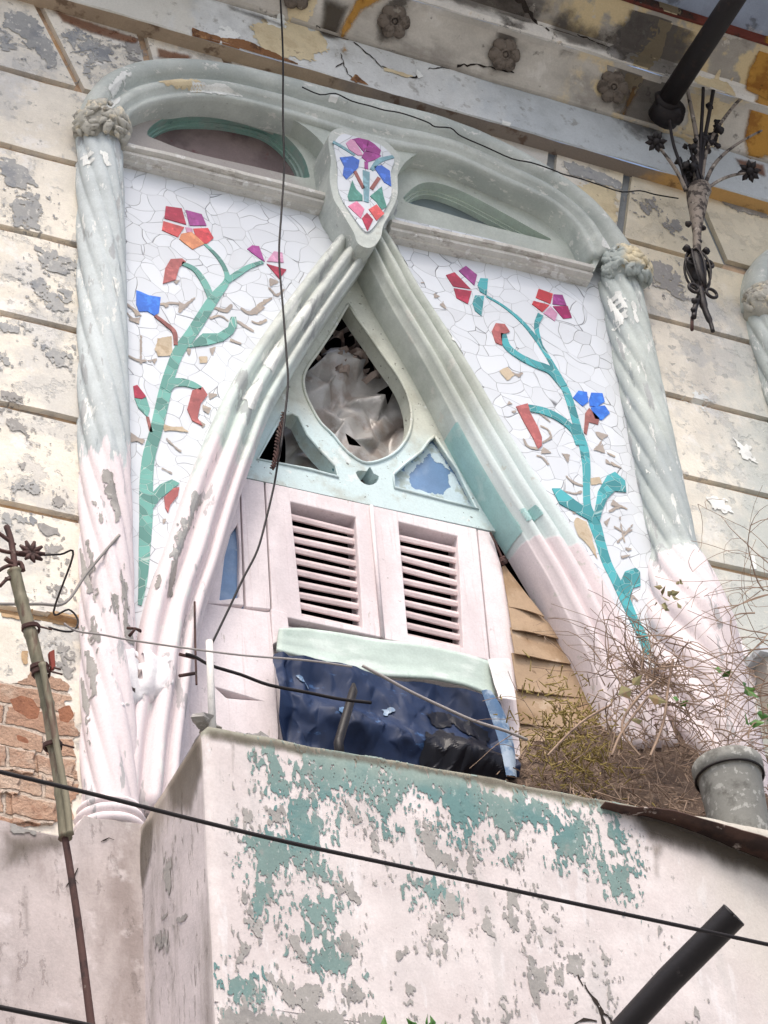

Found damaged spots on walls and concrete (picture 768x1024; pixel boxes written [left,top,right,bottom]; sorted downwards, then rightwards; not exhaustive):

peeling [0,10,150,108]
peeling [159,79,243,97]
peeling [192,0,330,65]
crack [316,25,387,78]
crack [411,64,514,78]
peeling [0,157,78,376]
peeling [607,291,639,331]
peeling [0,383,52,448]
peeling [164,424,189,452]
peeling [155,490,202,598]
flaking render [0,462,135,827]
peeling [213,734,650,1024]